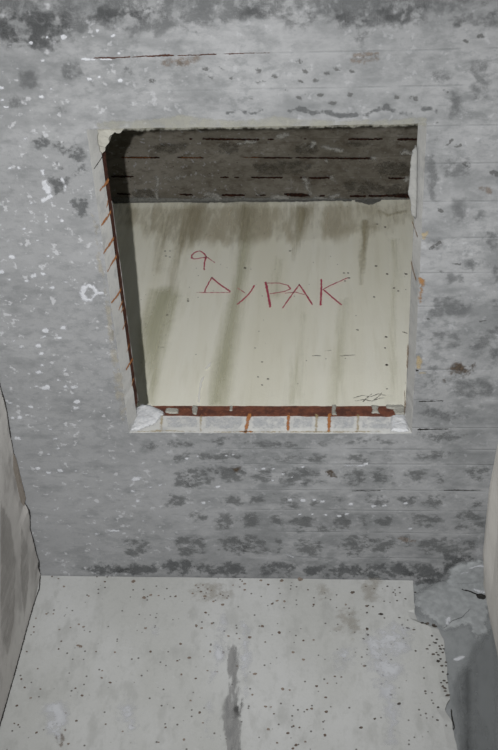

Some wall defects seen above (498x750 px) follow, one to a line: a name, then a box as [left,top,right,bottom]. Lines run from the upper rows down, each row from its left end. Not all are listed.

crack [94,51,269,59]
spalling [112,197,410,205]
damp [215,641,249,750]
spalling [406,622,450,696]